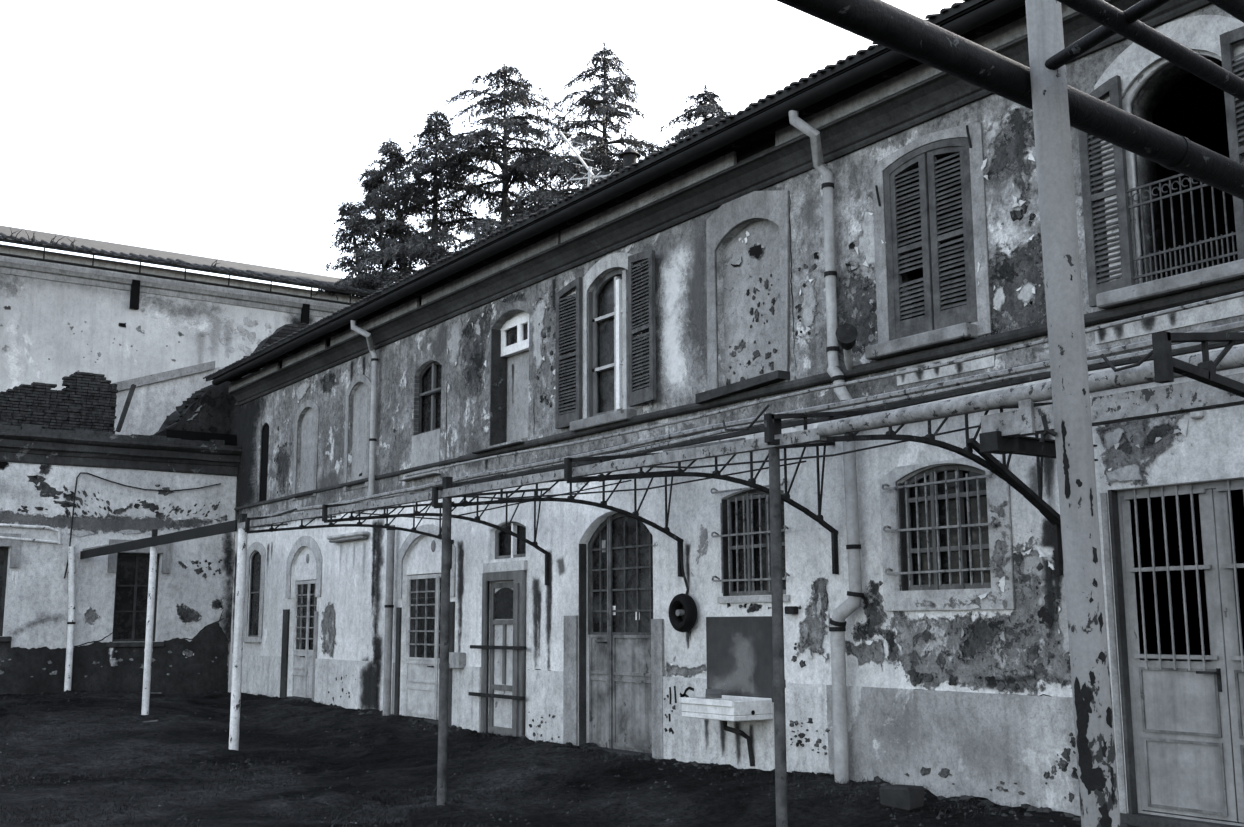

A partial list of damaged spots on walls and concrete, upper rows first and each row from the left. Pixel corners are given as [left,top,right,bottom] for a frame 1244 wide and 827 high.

peeling [977,105,1047,337]
peeling [726,274,777,385]
peeling [795,210,886,361]
peeling [0,464,228,537]
peeling [1096,413,1189,486]
damp [360,520,383,711]
peeling [791,577,830,668]
peeling [845,501,1115,827]
peeling [789,718,830,755]